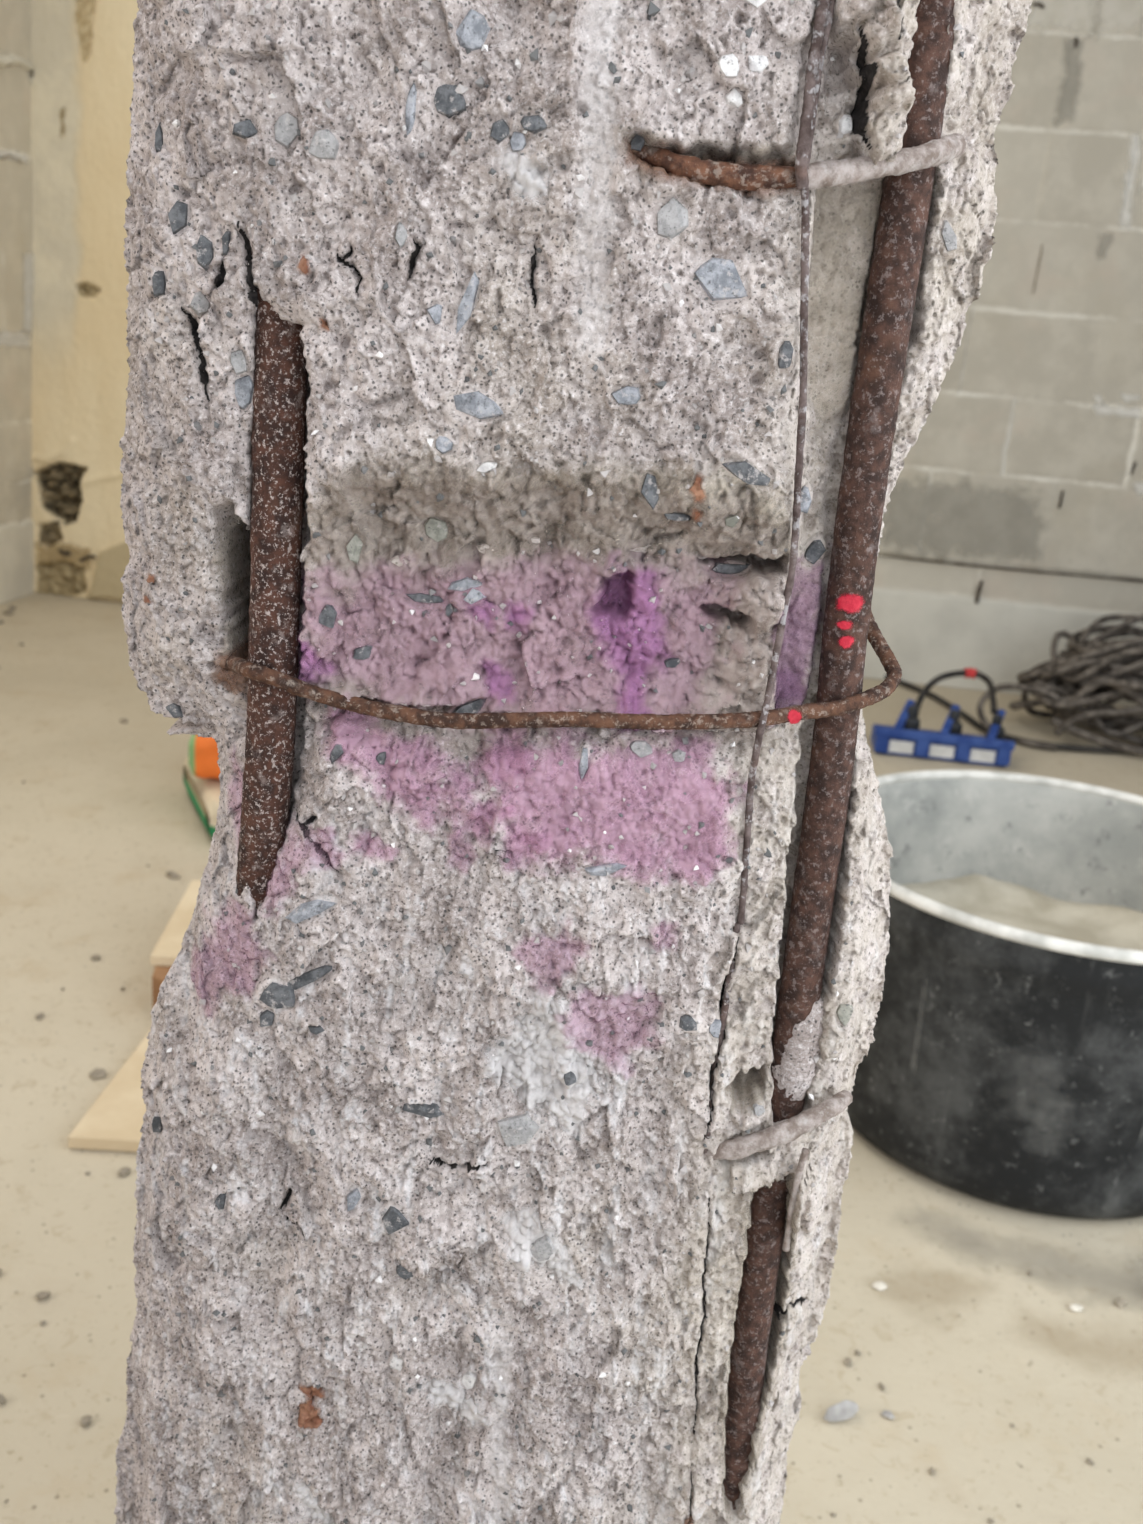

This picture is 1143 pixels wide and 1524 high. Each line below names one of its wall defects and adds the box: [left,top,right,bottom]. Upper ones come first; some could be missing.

spalling [902,0,955,148]
crack [214,221,258,307]
crack [337,246,362,293]
crack [181,307,210,402]
rust [214,639,249,694]
spalling [236,288,778,917]
spalling [770,167,936,1123]
crack [704,937,739,1140]
crack [688,1198,710,1519]
spalling [722,1176,788,1510]
crack [773,1297,807,1320]